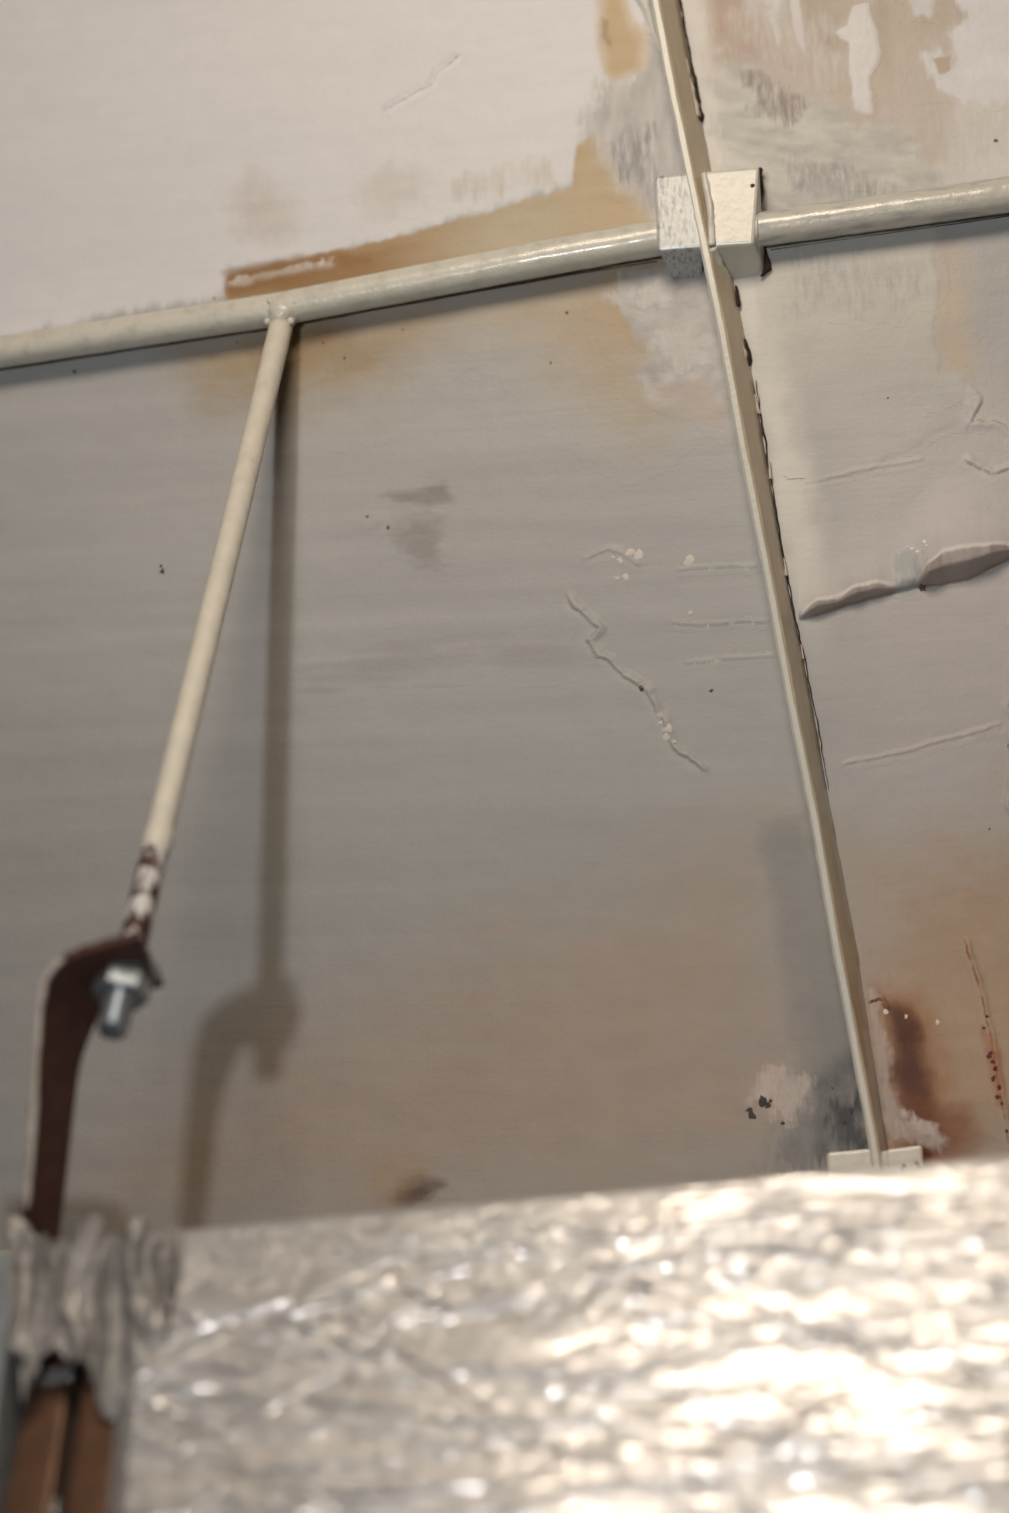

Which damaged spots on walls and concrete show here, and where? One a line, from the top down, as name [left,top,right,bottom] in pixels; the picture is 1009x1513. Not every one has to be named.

flaking render [630,0,661,55]
peeling [693,0,1009,183]
leakage [460,209,636,256]
leakage [352,256,708,486]
leakage [823,766,880,965]
leakage [59,757,808,1240]